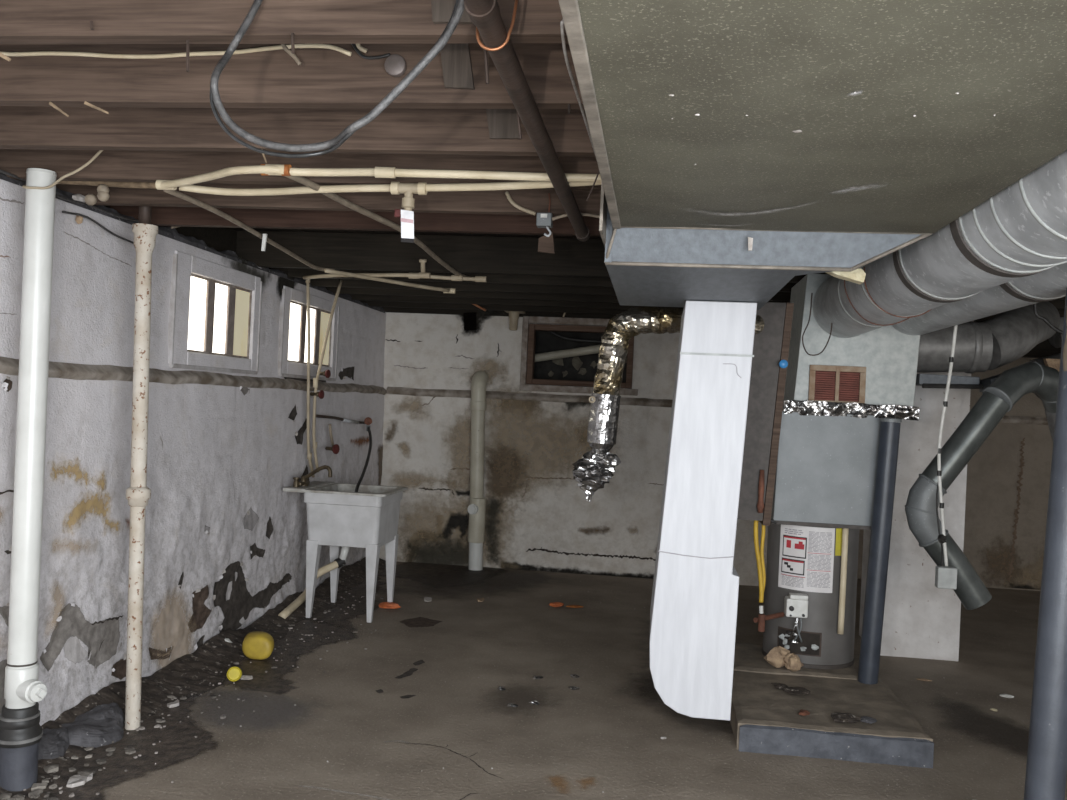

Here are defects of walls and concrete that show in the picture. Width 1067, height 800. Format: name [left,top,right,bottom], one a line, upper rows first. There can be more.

peeling [0,603,9,626]
spalling [40,603,127,680]
spalling [149,646,174,660]
spalling [178,508,296,650]
water stain [221,399,654,694]
crack [526,547,656,561]
water stain [24,694,217,800]
crack [396,742,503,800]